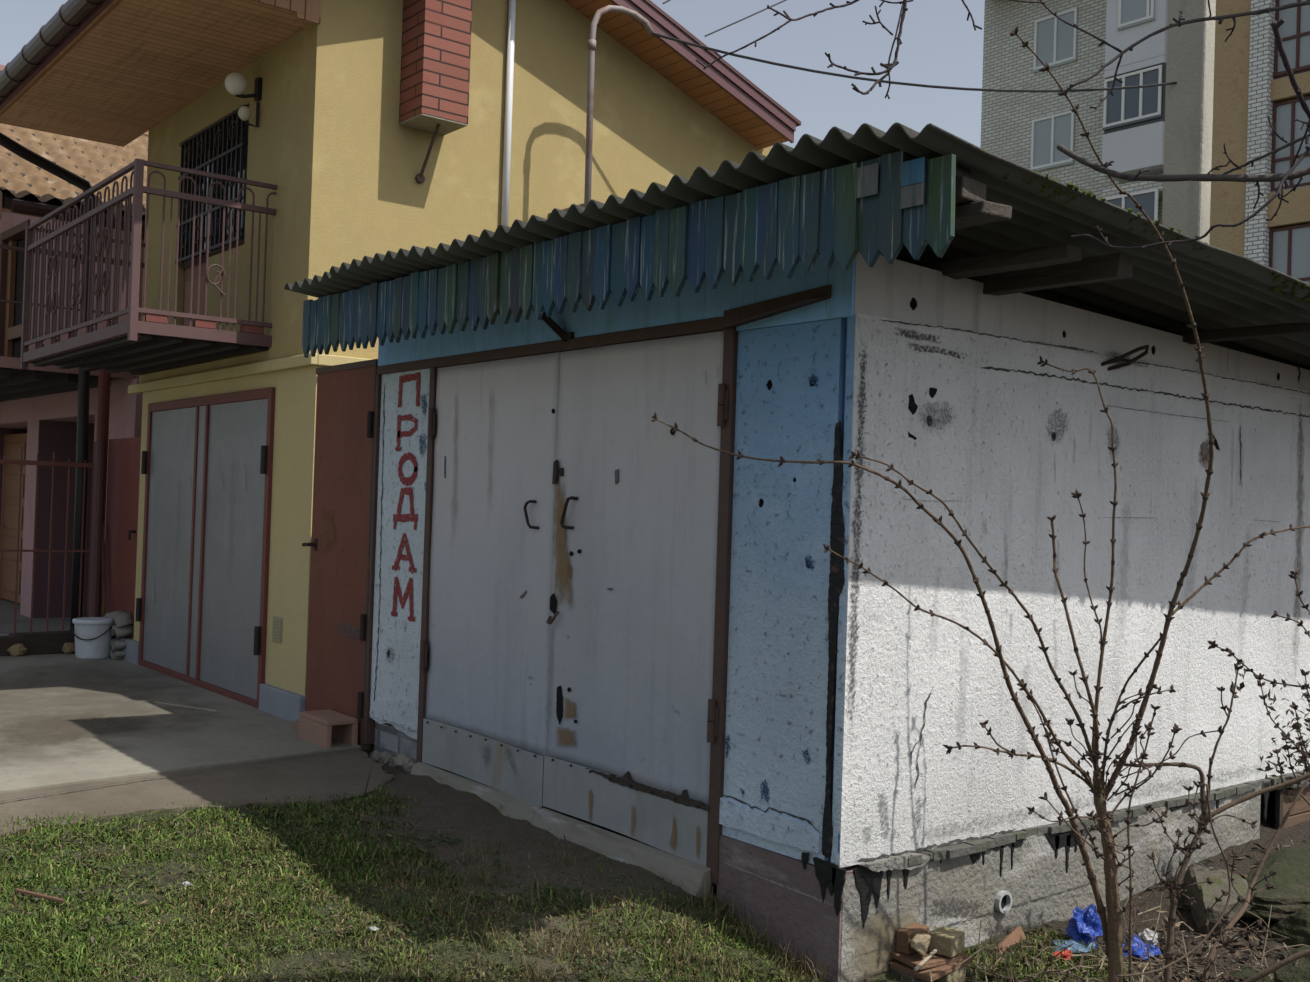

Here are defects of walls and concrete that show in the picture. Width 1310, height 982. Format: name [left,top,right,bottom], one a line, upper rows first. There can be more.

corrosion [553,484,572,604]
corrosion [557,699,575,746]